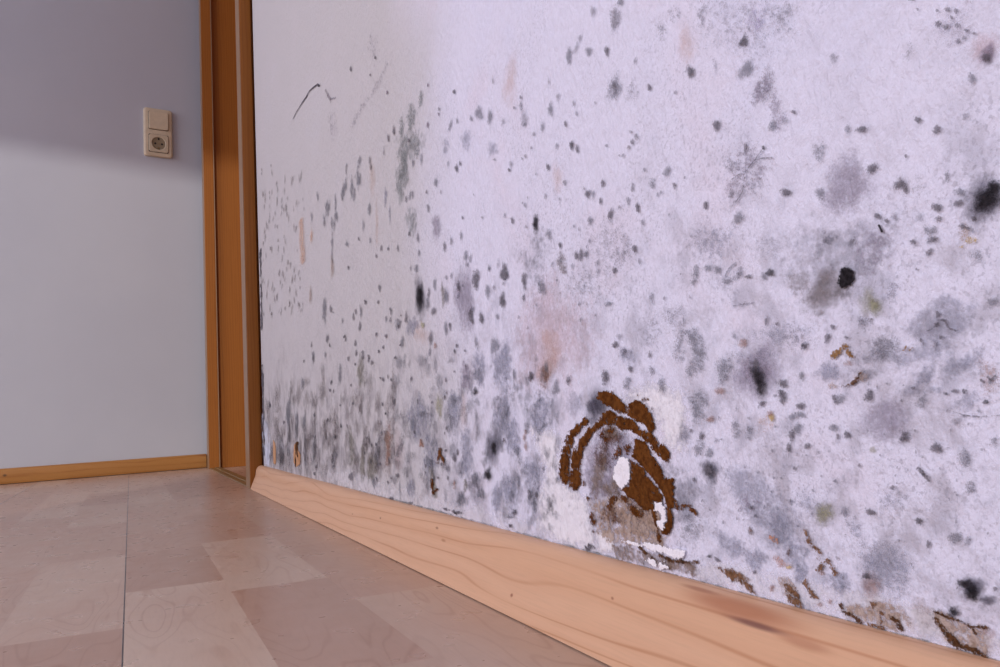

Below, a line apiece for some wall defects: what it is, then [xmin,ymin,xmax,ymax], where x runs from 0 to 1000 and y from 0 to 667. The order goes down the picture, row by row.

damp [383,84,428,154]
damp [910,204,941,255]
damp [959,181,1000,230]
damp [416,286,435,314]
damp [810,267,855,304]
damp [685,328,705,376]
damp [718,349,786,406]
damp [262,423,271,466]
damp [489,433,505,458]
damp [329,455,492,526]
damp [510,366,997,660]